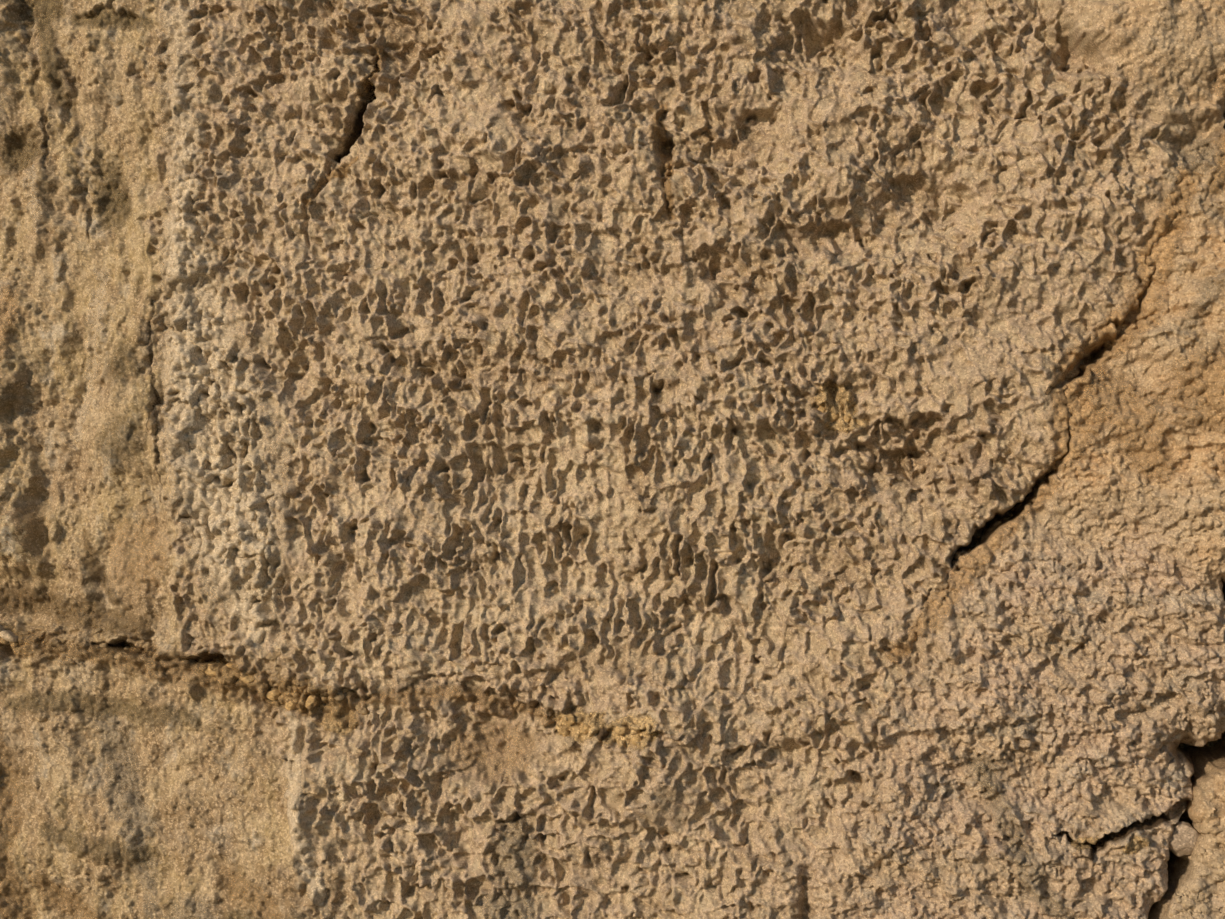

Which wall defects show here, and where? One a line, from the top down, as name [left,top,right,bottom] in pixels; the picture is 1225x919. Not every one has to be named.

crack [336,55,380,163]
crack [951,469,1056,570]
crack [90,641,237,668]
crack [1057,813,1170,860]